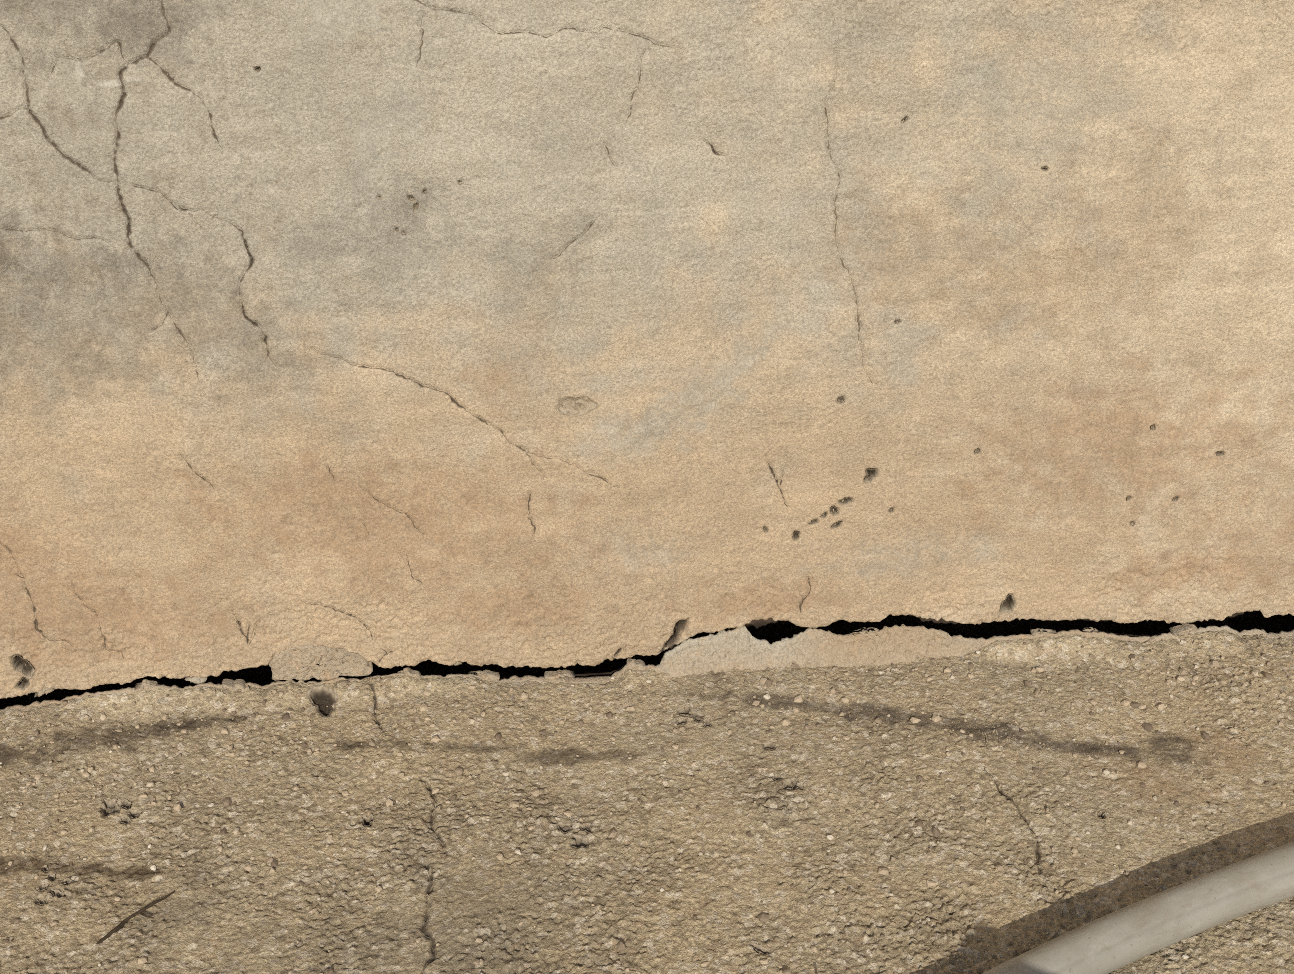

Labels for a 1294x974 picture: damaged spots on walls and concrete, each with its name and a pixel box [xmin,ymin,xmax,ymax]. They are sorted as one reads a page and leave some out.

crack [416,0,662,119]
crack [0,1,221,382]
crack [232,224,272,361]
crack [0,543,71,645]
crack [362,497,424,587]
crack [335,357,615,532]
crack [0,579,1294,729]
crack [768,463,788,507]
crack [421,781,447,974]